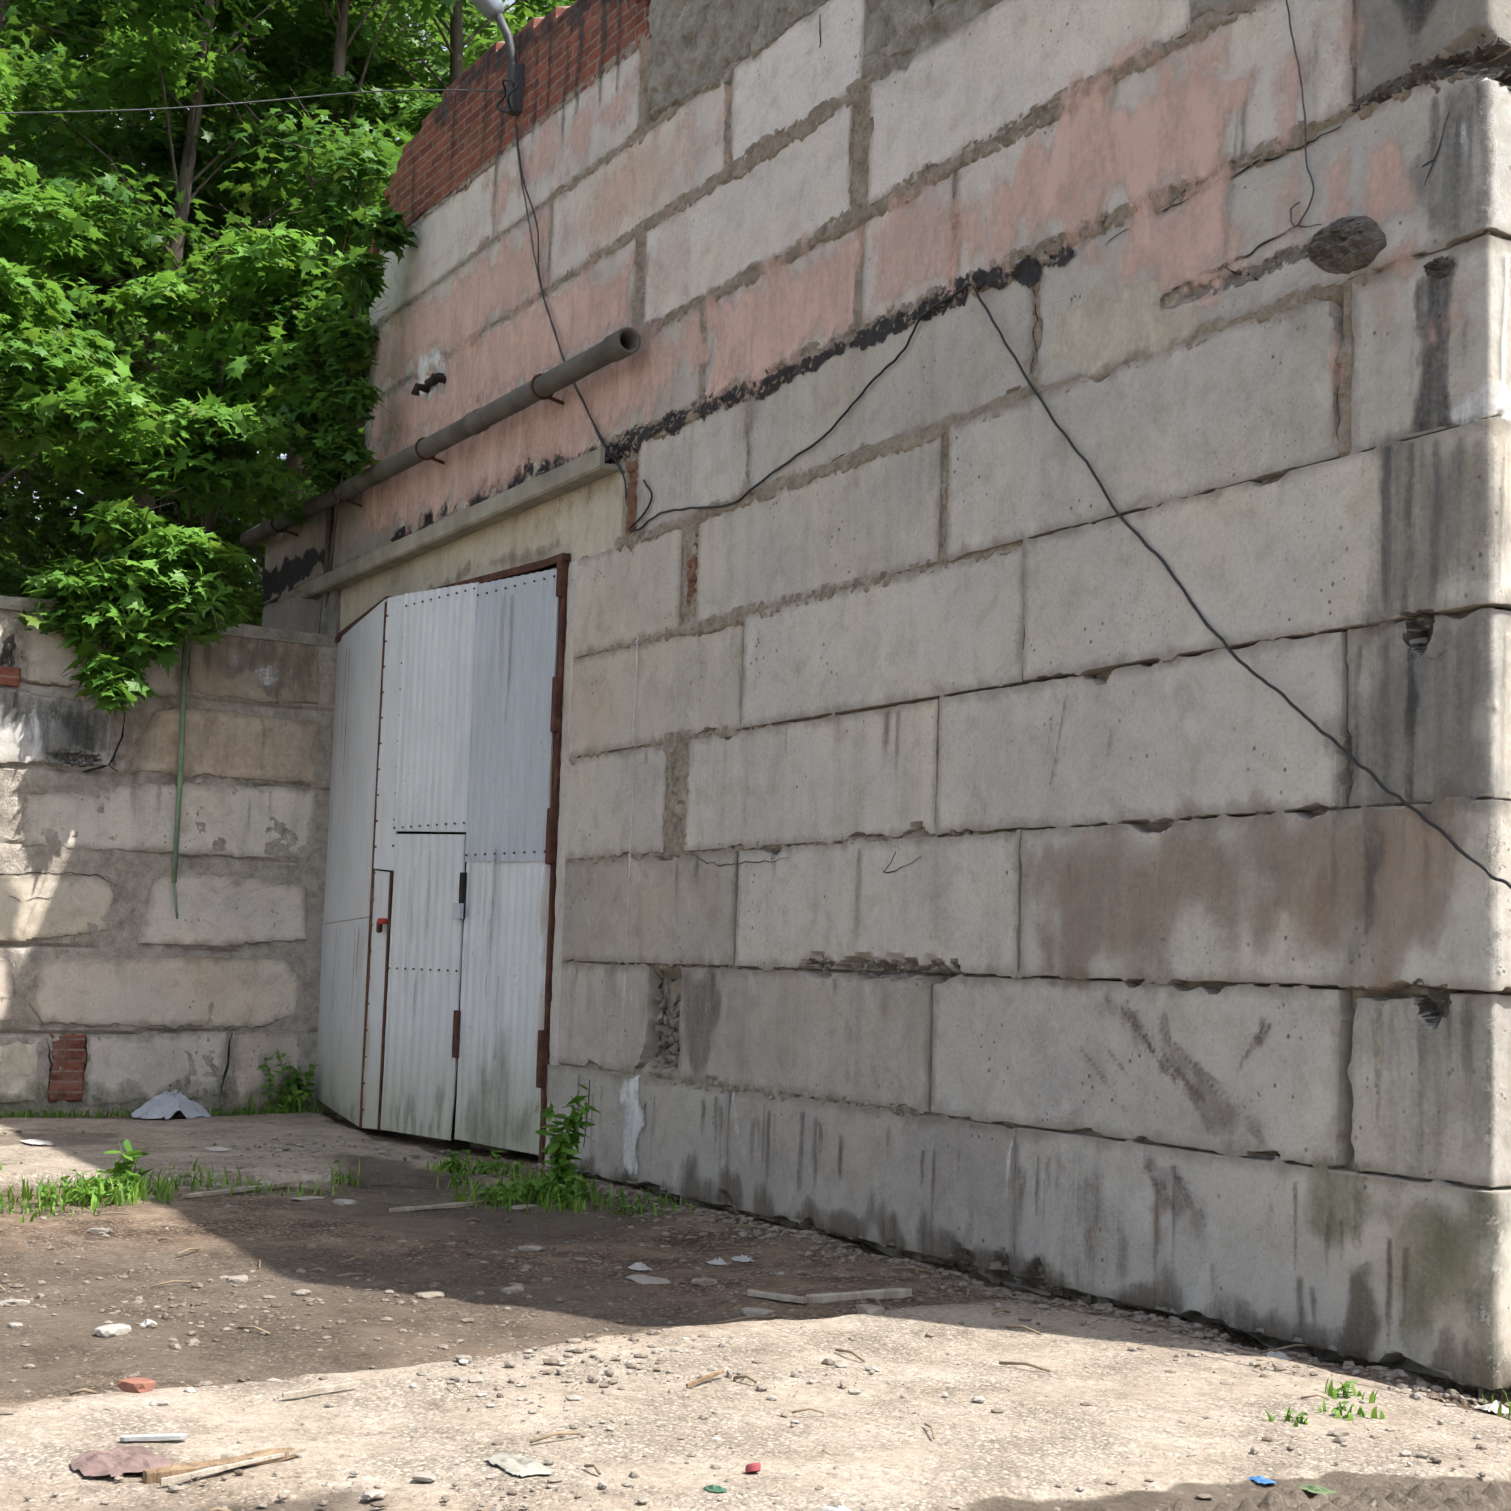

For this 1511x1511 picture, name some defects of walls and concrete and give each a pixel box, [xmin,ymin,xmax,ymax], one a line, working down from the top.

spalling [1348,37,1511,217]
peeling [362,211,861,533]
leakage [390,245,1078,542]
leakage [1381,259,1511,612]
leakage [262,547,325,603]
leakage [0,692,109,765]
spalling [799,955,961,983]
spalling [1412,978,1463,1023]
leakage [620,1077,645,1174]
leakage [1343,1240,1392,1354]